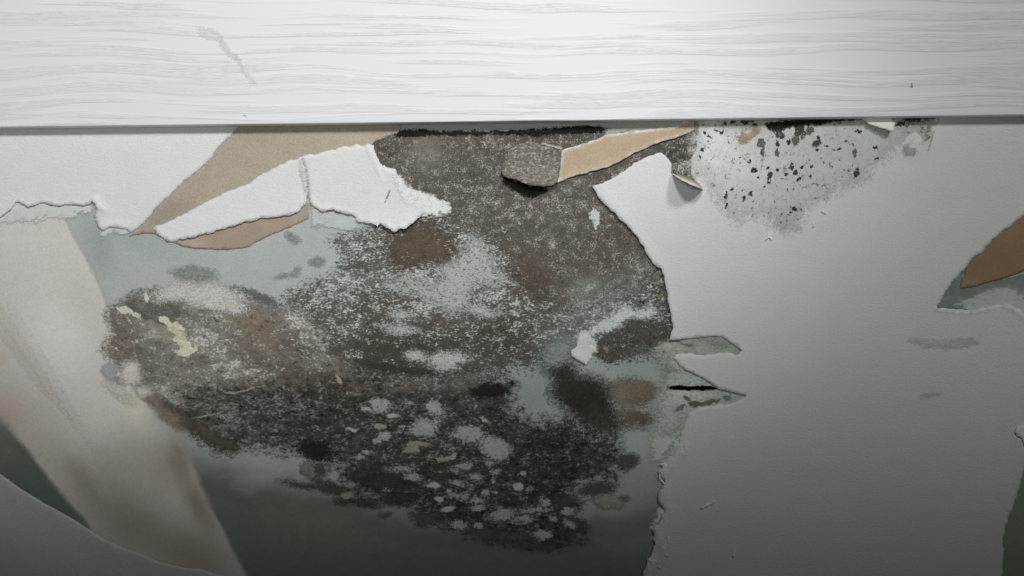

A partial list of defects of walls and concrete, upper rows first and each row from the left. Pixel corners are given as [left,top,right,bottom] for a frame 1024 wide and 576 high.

water stain [896,118,934,127]
spalling [502,174,547,198]
peeling [589,207,600,230]
peeling [116,306,141,320]
water stain [0,119,862,576]
peeling [571,330,609,365]
crack [667,384,718,392]
spalling [648,336,746,438]